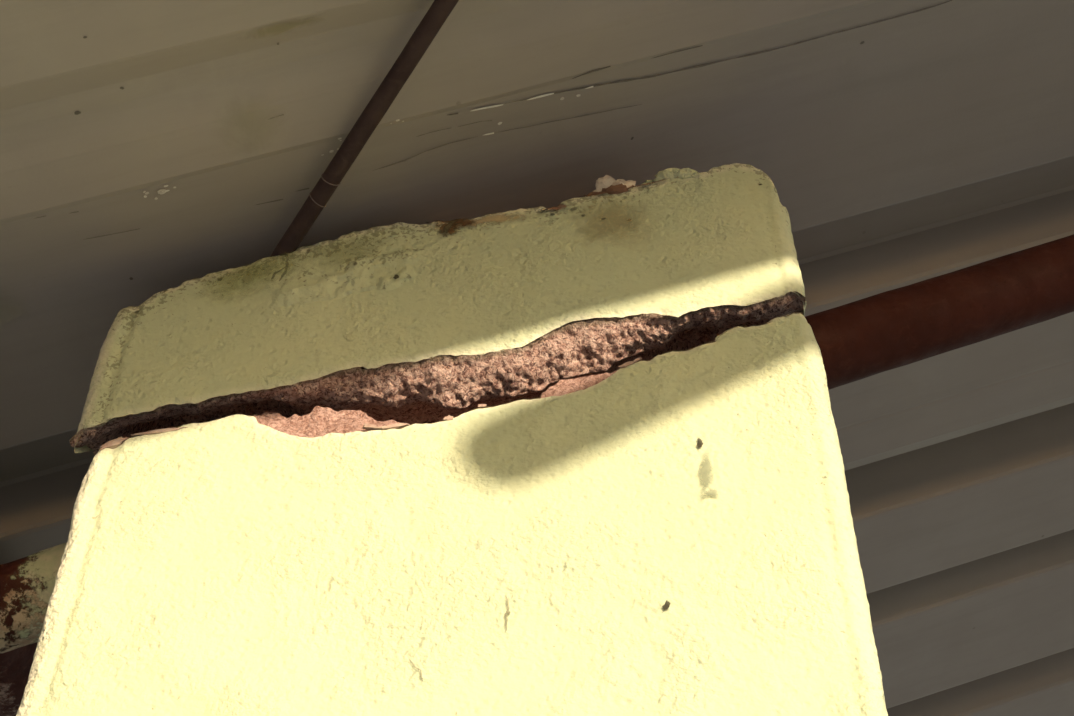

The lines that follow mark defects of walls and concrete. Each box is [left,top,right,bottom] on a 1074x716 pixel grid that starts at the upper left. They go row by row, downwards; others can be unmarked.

crack [69,291,806,455]